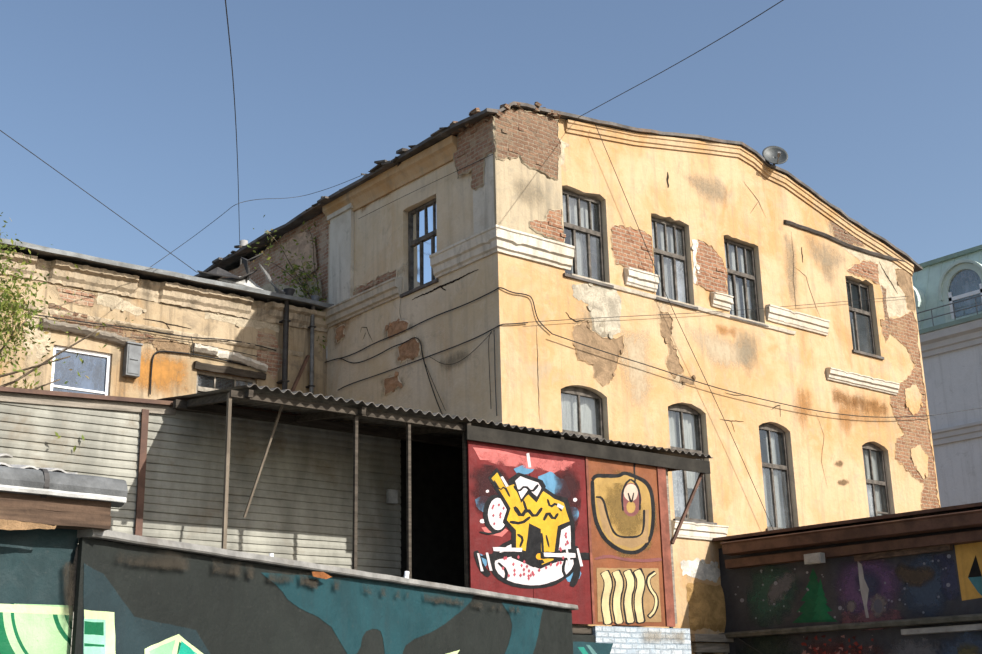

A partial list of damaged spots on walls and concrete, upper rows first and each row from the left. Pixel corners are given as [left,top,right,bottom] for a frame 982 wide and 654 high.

flaking render [449,102,569,191]
flaking render [529,208,566,243]
flaking render [610,224,654,273]
flaking render [691,239,728,294]
flaking render [384,318,422,396]
flaking render [571,283,624,387]
flaking render [659,304,696,388]
flaking render [830,220,940,510]
flaking render [680,558,720,583]